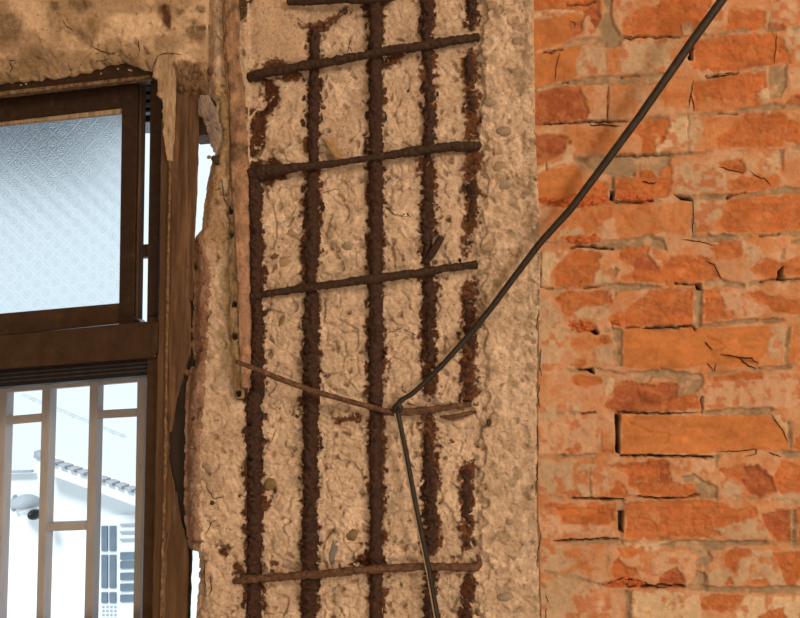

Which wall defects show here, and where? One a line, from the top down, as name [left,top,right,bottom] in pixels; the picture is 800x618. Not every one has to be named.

rust [245,56,327,165]
rust [298,4,370,74]
rust [458,47,483,263]
crack [689,73,729,109]
rust [298,169,325,280]
spalling [183,239,212,552]
spalling [244,0,494,618]
rust [417,275,442,401]
rust [457,279,482,406]
crack [626,414,789,457]
crack [704,342,759,371]
rust [457,574,479,618]